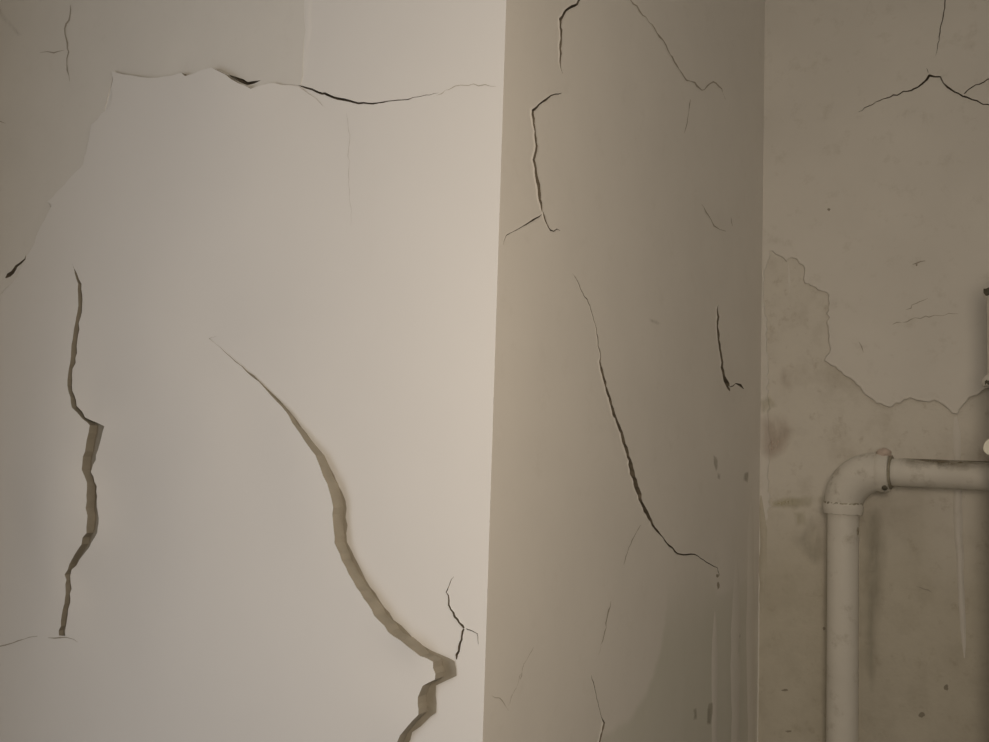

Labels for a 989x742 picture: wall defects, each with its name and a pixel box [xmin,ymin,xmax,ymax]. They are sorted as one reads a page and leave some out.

crack [502,0,581,245]
crack [631,1,726,133]
crack [858,0,989,113]
crack [0,421,104,647]
crack [246,370,307,434]
crack [329,467,480,742]
crack [573,274,720,588]
crack [715,305,744,391]
peeling [758,249,989,742]